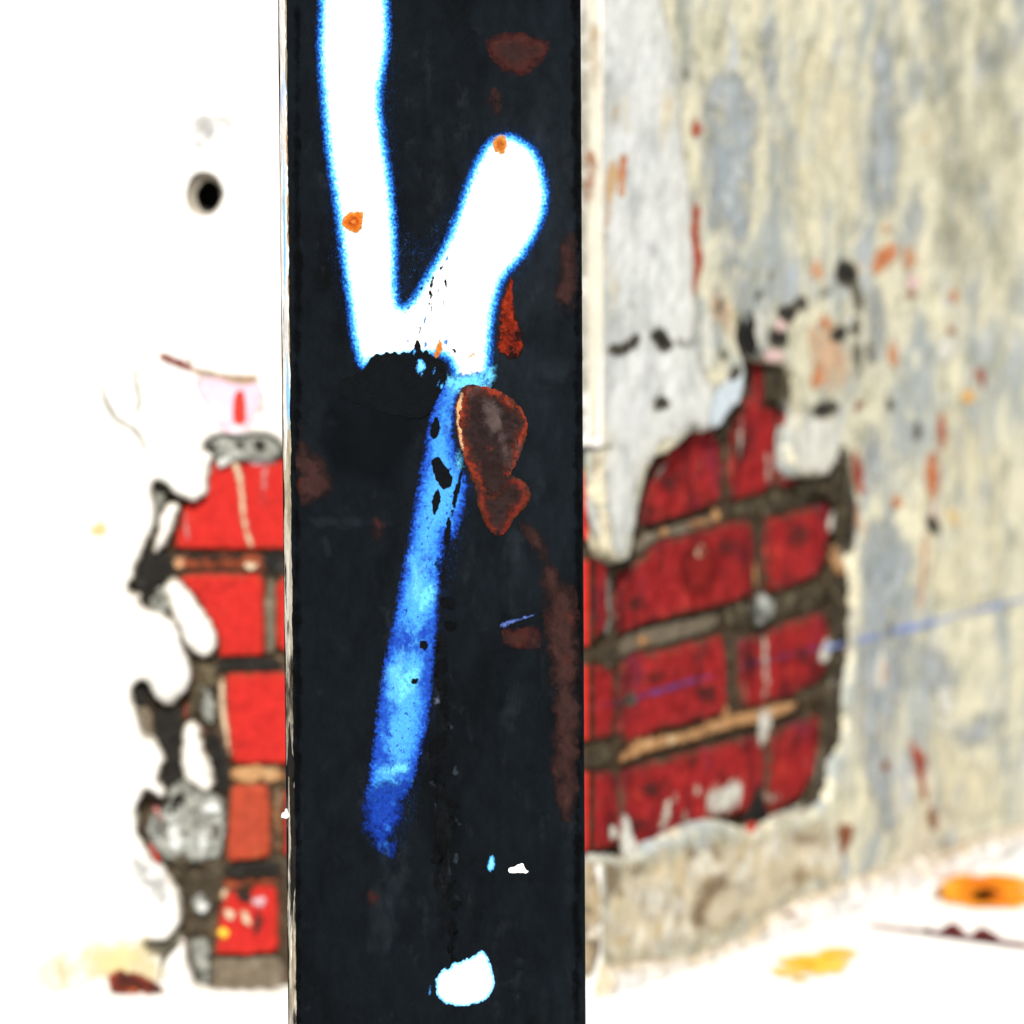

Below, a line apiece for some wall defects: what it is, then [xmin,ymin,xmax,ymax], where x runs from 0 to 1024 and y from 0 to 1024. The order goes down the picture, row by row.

rust [487,32,547,75]
spalling [130,376,290,989]
rust [497,279,523,359]
rust [454,384,582,822]
spalling [583,0,850,860]
spalling [108,969,166,995]